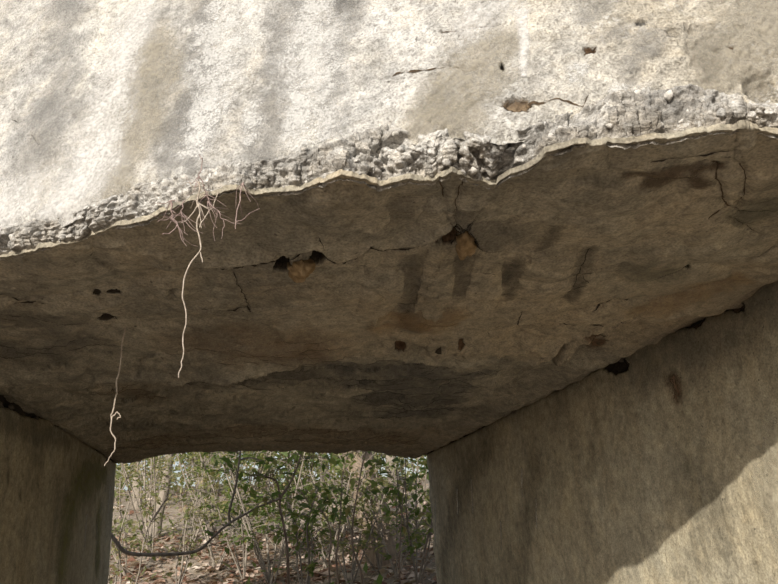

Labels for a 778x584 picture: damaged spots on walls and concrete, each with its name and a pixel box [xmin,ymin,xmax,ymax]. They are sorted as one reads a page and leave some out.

damp [244,0,360,160]
crack [392,67,453,77]
damp [410,0,529,134]
crack [528,96,588,107]
spalling [0,84,778,260]
crack [439,178,481,250]
crack [650,150,775,233]
crack [221,254,300,312]
crack [318,237,415,264]